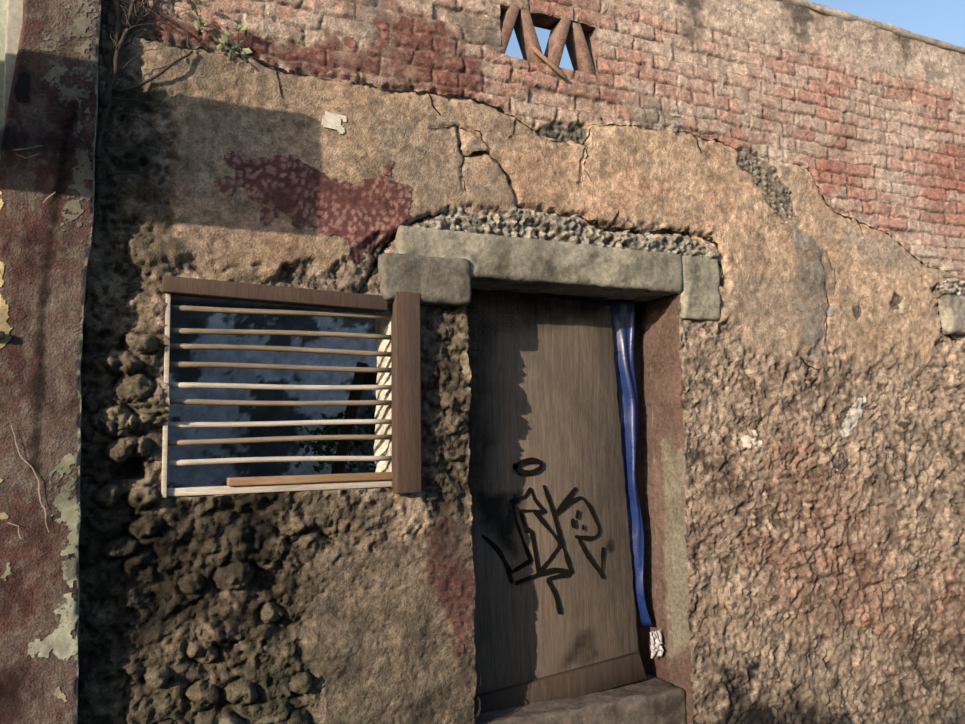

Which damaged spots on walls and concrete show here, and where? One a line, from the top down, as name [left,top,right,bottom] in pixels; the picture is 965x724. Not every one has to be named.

peeling [141,7,489,99]
peeling [38,0,101,231]
crack [138,36,737,294]
peeling [214,151,721,263]
spalling [539,116,589,146]
spalling [737,144,795,223]
spalling [936,278,965,298]
peeling [27,452,80,660]
water stain [704,669,816,724]